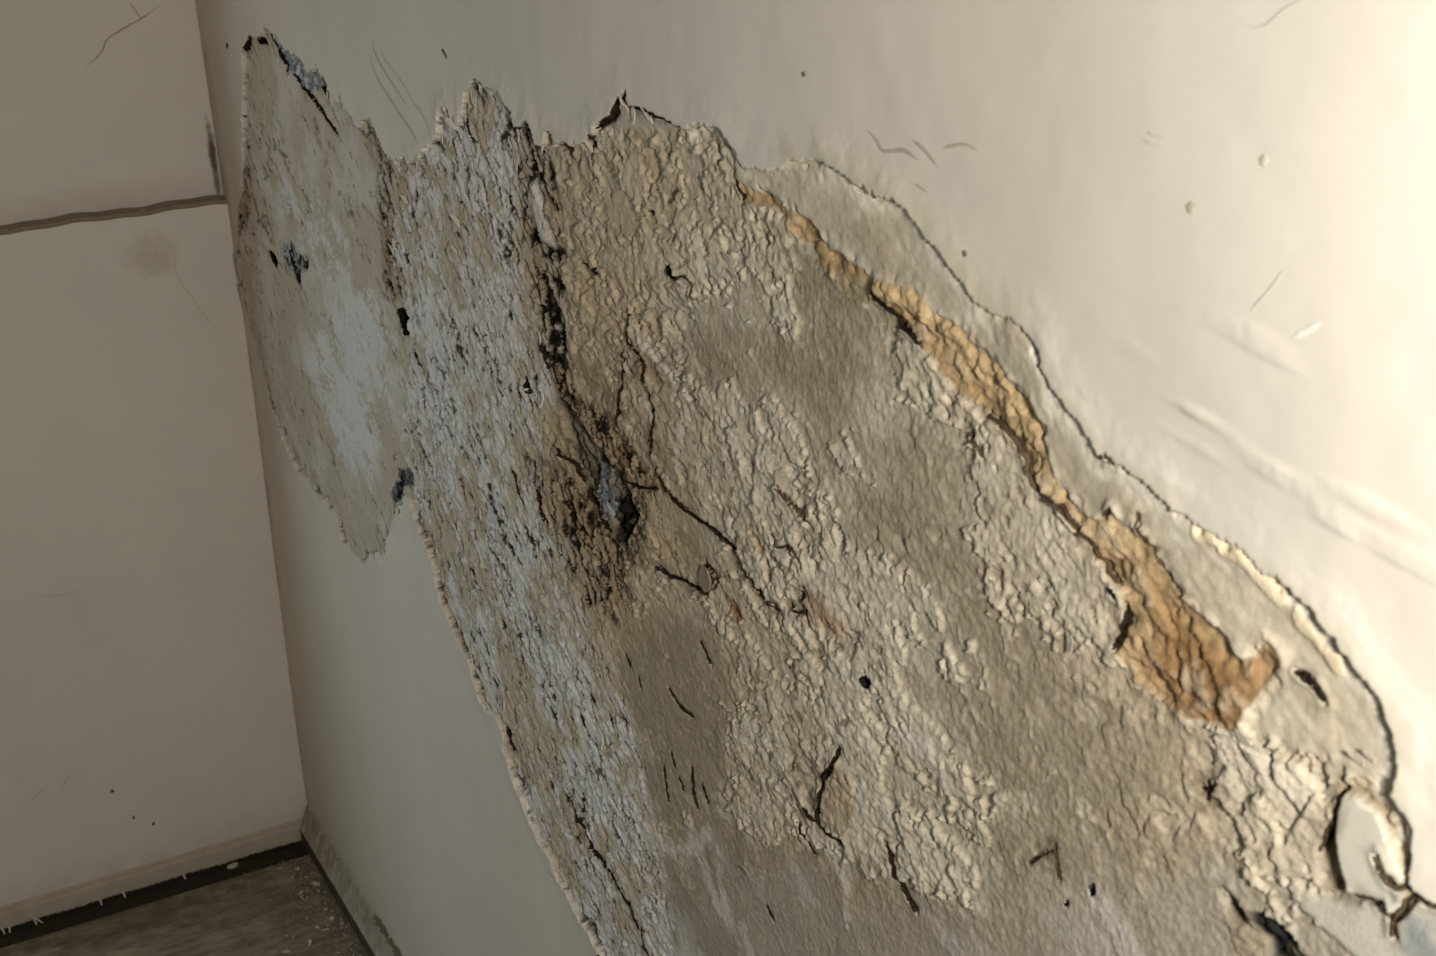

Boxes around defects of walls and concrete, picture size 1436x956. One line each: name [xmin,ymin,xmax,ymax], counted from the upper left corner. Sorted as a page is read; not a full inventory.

crack [673,275,697,300]
crack [512,470,549,524]
crack [538,314,808,616]
peeling [235,30,1416,956]
crack [626,654,694,718]
crack [580,714,614,728]
crack [663,752,709,809]
crack [796,748,843,855]
crack [1319,788,1349,852]
crack [886,845,918,913]
crack [1356,856,1436,937]
peeling [1399,900,1436,947]